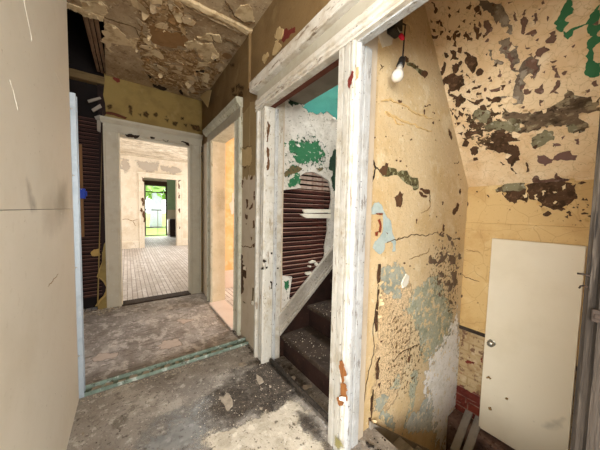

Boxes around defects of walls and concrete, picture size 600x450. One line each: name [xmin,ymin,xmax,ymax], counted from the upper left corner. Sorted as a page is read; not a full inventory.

peeling [67,0,232,96]
peeling [234,3,255,22]
peeling [262,26,295,64]
peeling [430,0,600,222]
spalling [270,132,336,299]
peeling [374,224,463,363]
crack [387,232,480,322]
peeling [337,360,348,407]
peeling [368,357,396,432]